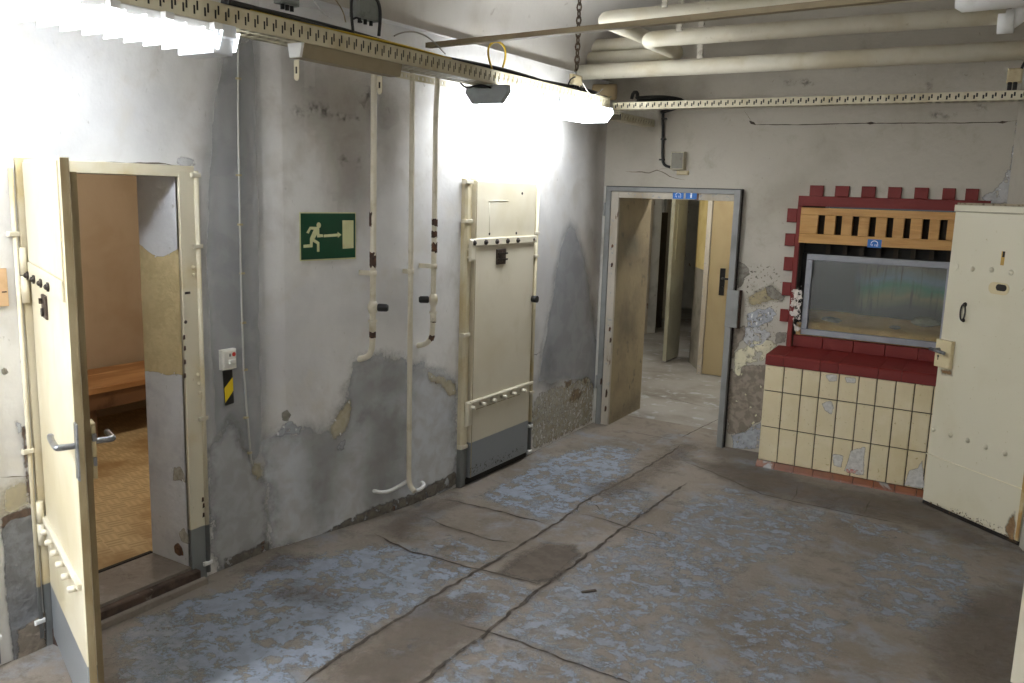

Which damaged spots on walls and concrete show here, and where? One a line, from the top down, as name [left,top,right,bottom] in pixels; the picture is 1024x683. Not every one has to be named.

crack [745,112,1017,125]
damp [539,227,596,387]
peeling [790,286,802,332]
flaking render [727,262,780,434]
flaking render [532,377,593,448]
spalling [905,462,924,488]
peeling [114,446,851,683]
damp [498,543,580,584]